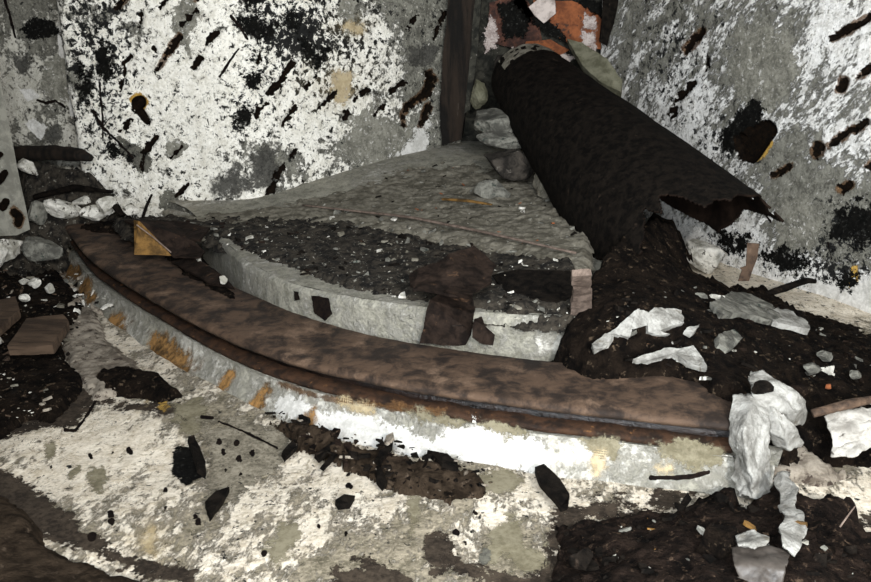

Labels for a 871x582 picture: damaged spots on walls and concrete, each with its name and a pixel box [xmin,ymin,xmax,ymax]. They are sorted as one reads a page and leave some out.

water stain [232,0,341,70]
spalling [529,0,556,23]
peeling [716,22,805,164]